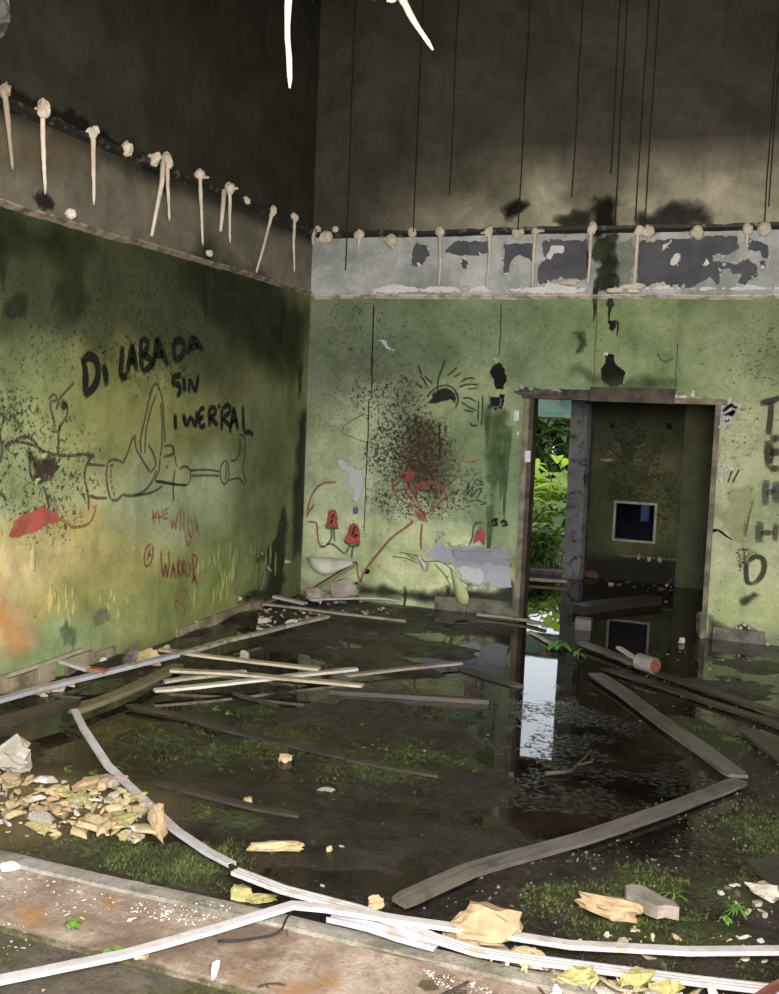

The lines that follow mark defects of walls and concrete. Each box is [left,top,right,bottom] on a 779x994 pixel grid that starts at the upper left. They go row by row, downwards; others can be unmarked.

peeling [411,243,430,268]
spalling [371,283,492,294]
peeling [445,240,488,269]
peeling [503,239,589,294]
peeling [637,235,779,295]
water stain [30,453,63,486]
water stain [238,414,306,602]
peeling [416,531,513,604]